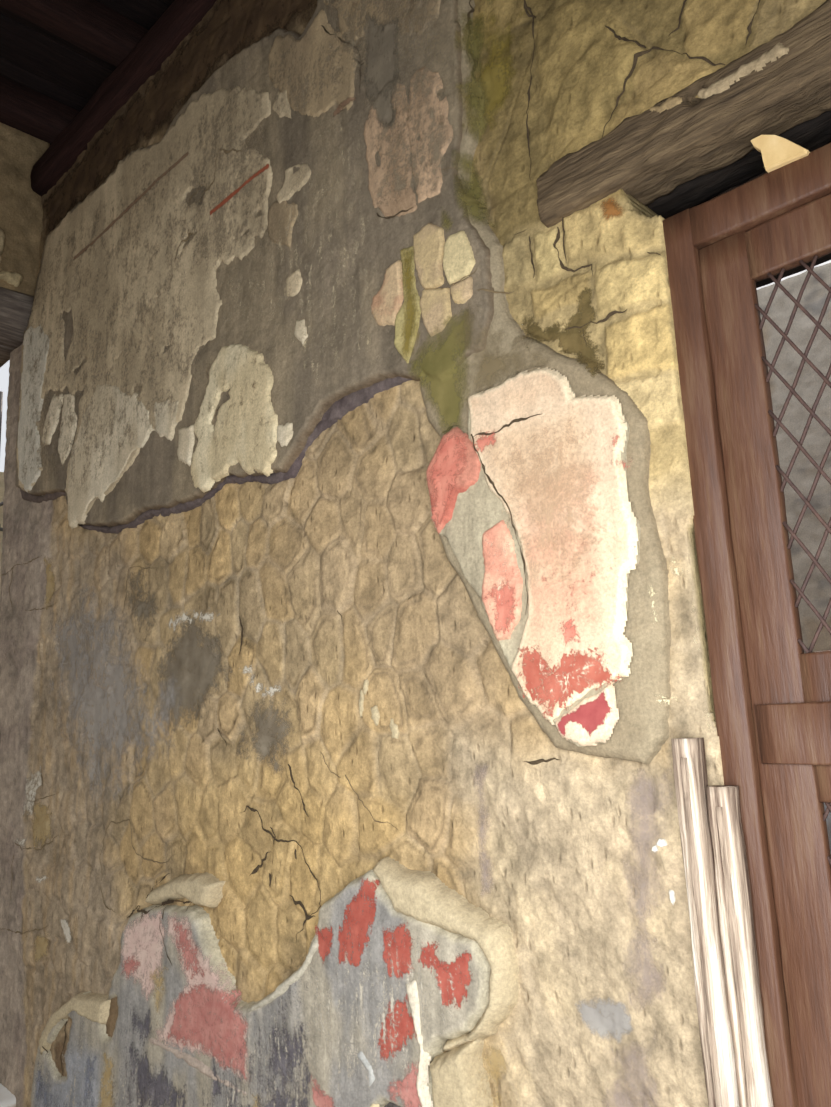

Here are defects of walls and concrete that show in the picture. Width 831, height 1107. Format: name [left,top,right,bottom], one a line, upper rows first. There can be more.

crack [602,0,725,137]
flaking render [15,0,494,534]
damp [403,251,417,354]
crack [450,217,593,294]
crack [565,309,627,346]
crack [471,414,540,614]
crack [288,764,308,816]
crack [240,805,321,941]
flaking render [50,1017,72,1077]
flaking render [106,997,118,1037]
peeling [357,1051,375,1088]
peeling [406,980,433,1107]